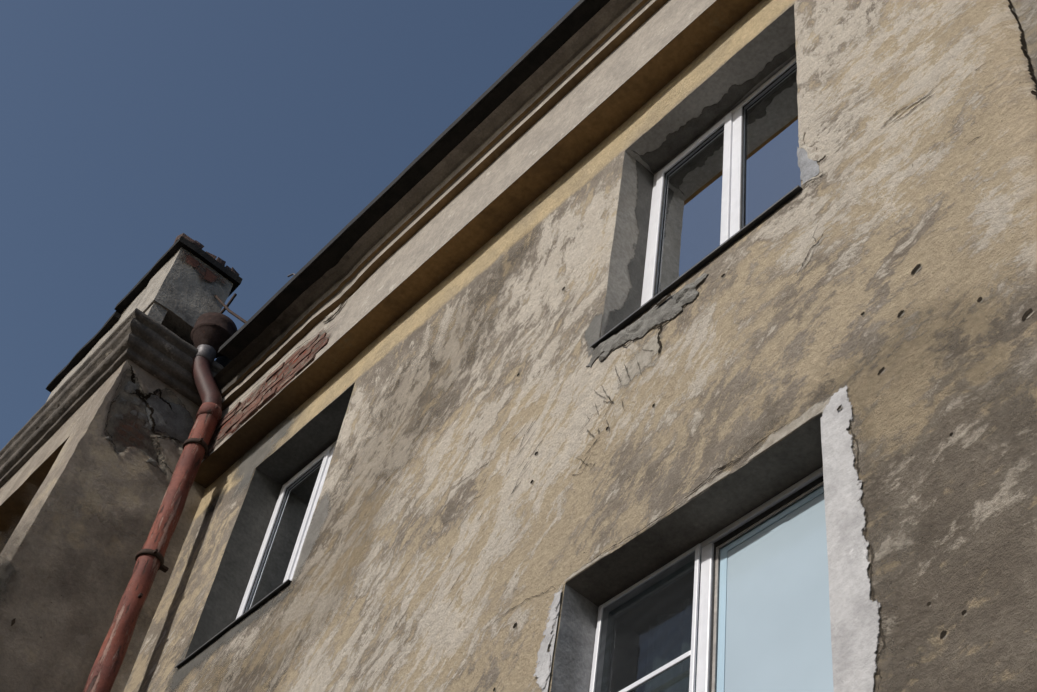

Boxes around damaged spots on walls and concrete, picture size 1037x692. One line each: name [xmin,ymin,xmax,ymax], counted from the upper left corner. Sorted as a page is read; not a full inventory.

crack [1008,0,1037,92]
flaking render [798,132,826,162]
spalling [586,273,725,388]
spalling [105,361,194,475]
flaking render [203,328,331,459]
spalling [487,397,843,692]